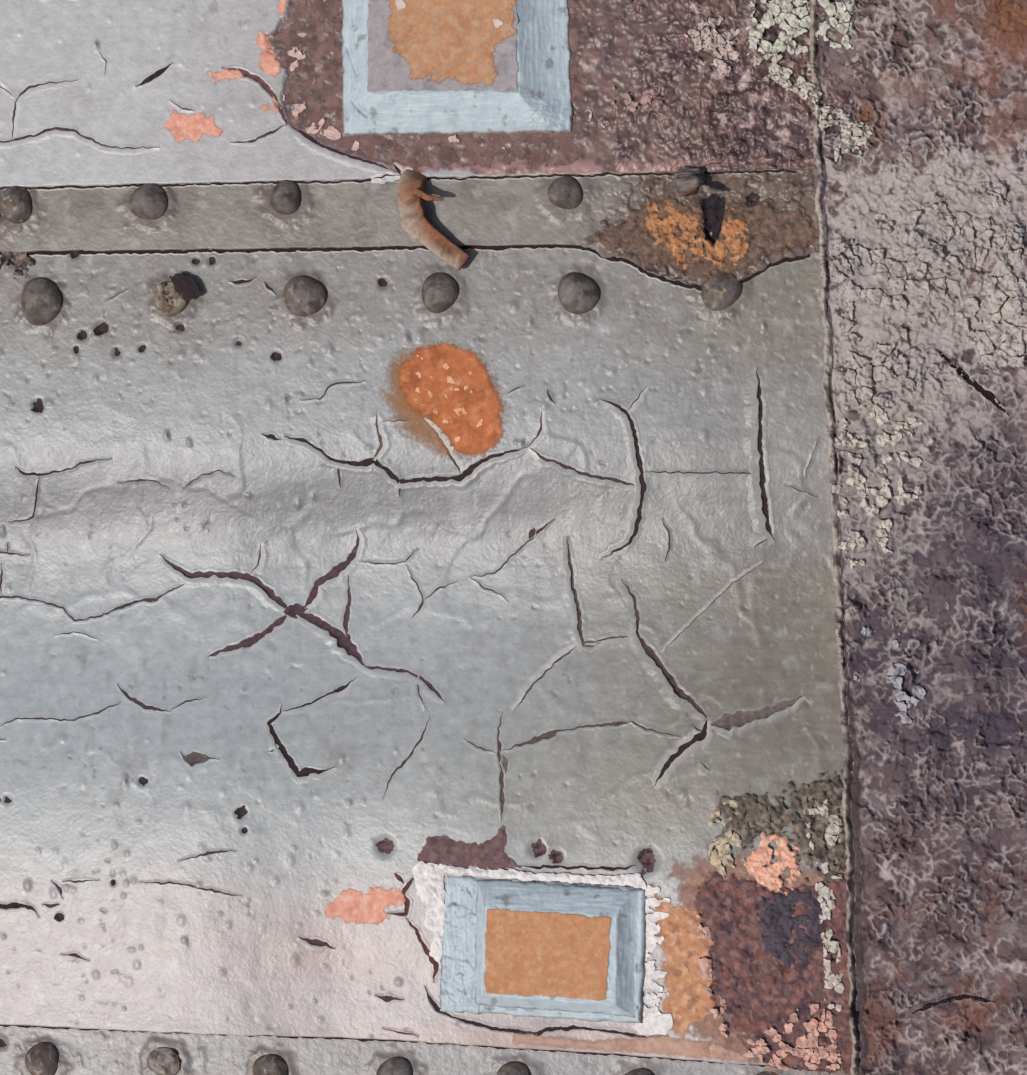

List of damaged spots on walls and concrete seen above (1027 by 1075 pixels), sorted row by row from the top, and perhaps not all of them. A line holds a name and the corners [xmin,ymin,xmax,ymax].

crack [0,49,176,156]
crack [135,61,196,113]
peeling [163,110,223,143]
crack [221,65,290,146]
crack [0,160,675,191]
spalling [745,192,760,206]
corrosion [386,343,502,455]
crack [8,456,112,525]
crack [261,2,876,1075]
crack [0,517,556,802]
peeling [325,825,656,969]
corrosion [514,848,852,1075]